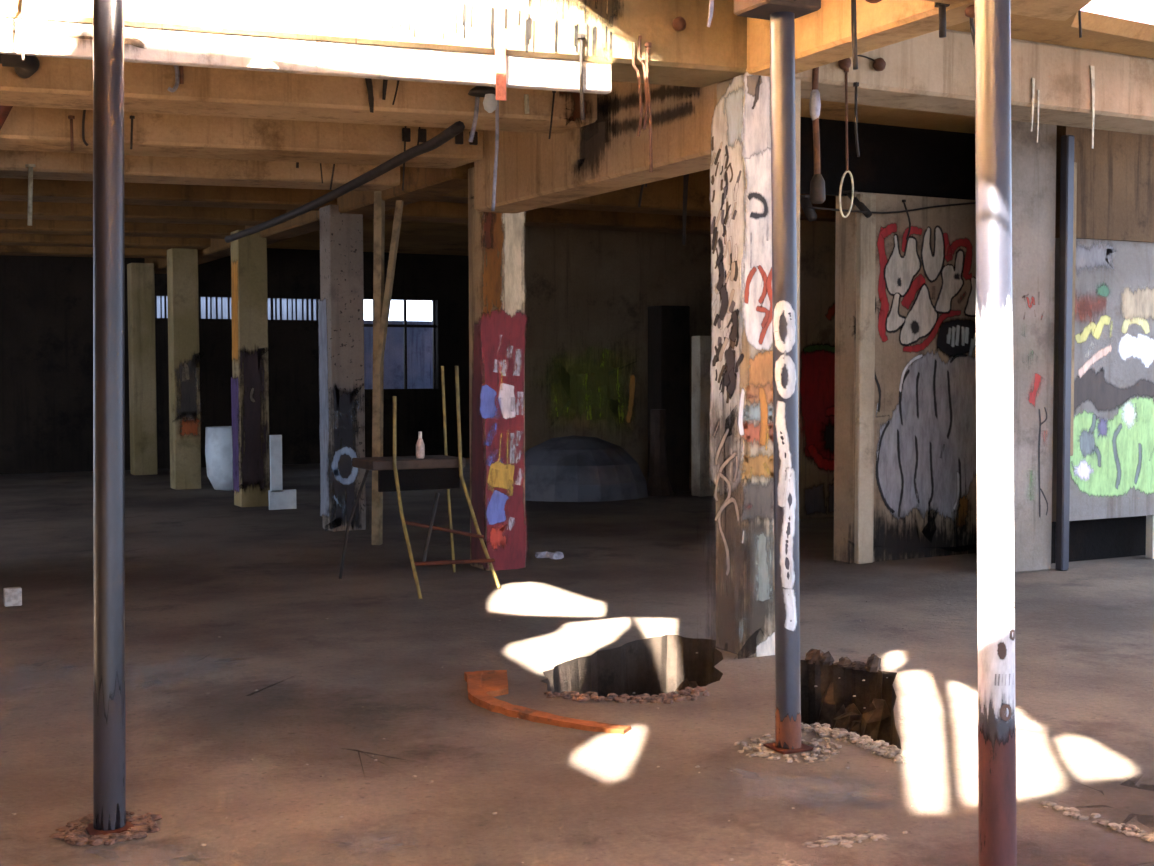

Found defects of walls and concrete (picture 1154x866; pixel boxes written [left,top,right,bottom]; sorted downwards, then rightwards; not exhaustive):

hole [541,634,723,697]
hole [800,660,901,749]